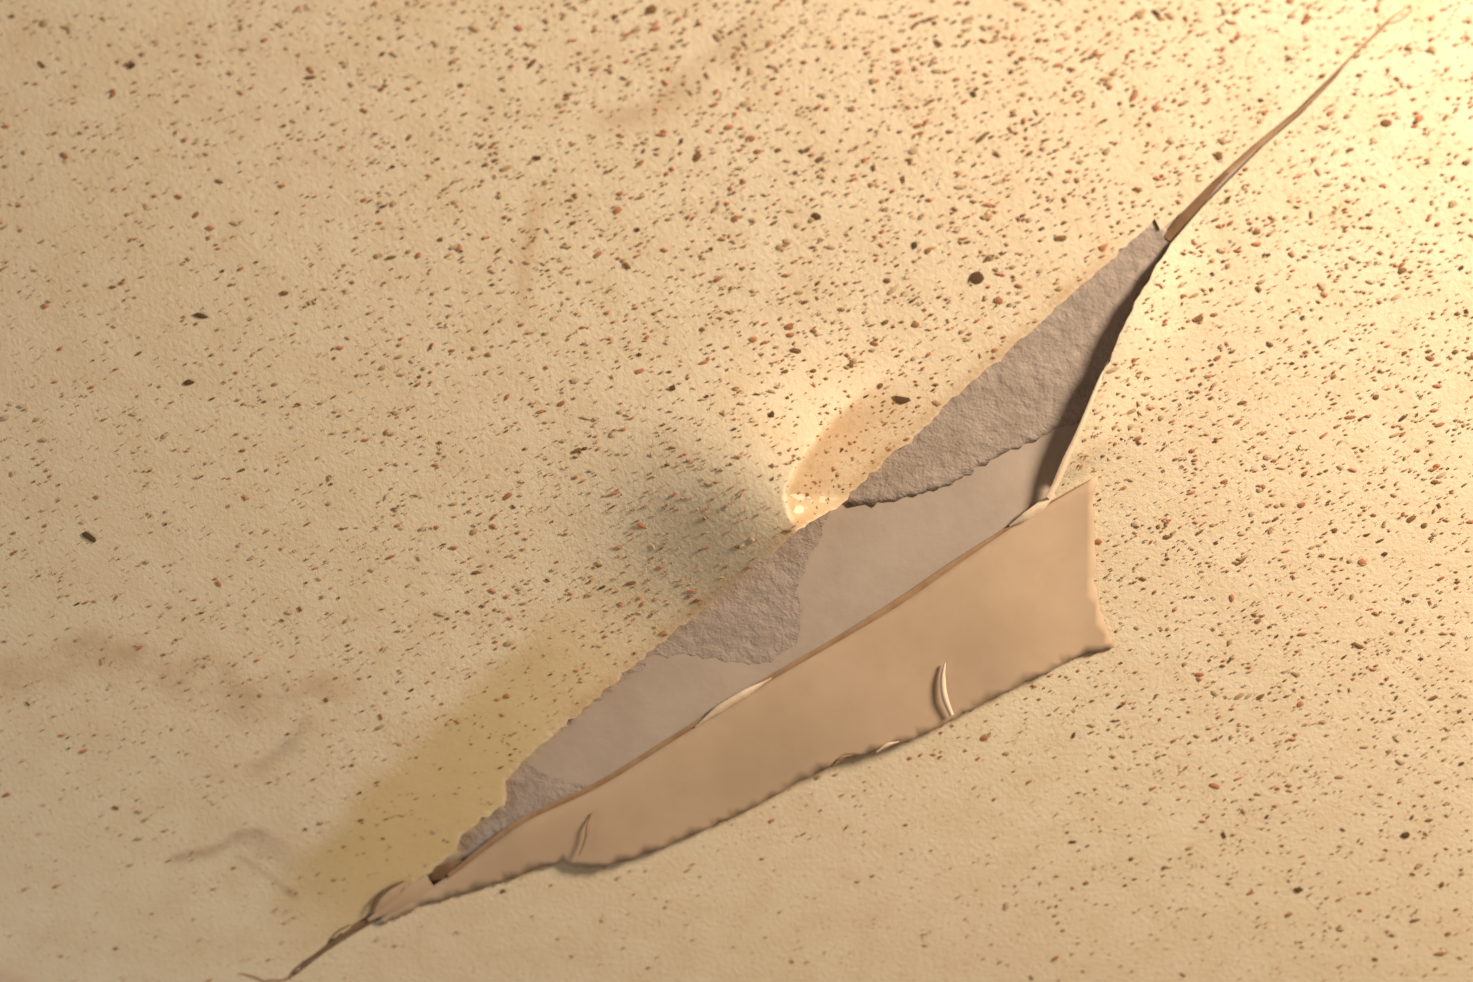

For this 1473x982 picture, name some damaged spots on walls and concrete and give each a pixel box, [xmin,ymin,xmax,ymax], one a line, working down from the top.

crack [1164,8,1413,242]
peeling [293,66,1345,977]
crack [240,918,375,982]